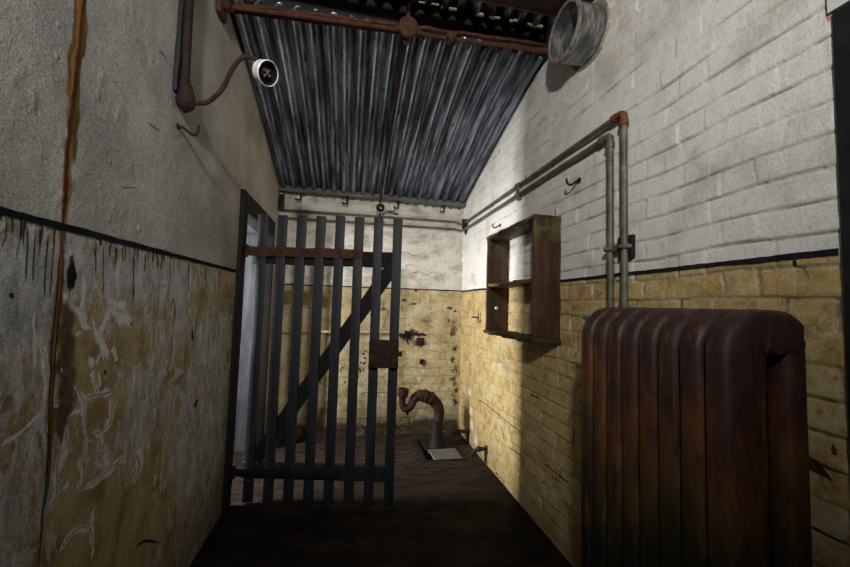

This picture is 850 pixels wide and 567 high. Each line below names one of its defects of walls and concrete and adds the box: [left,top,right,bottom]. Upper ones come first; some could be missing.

rust [39,0,87,561]